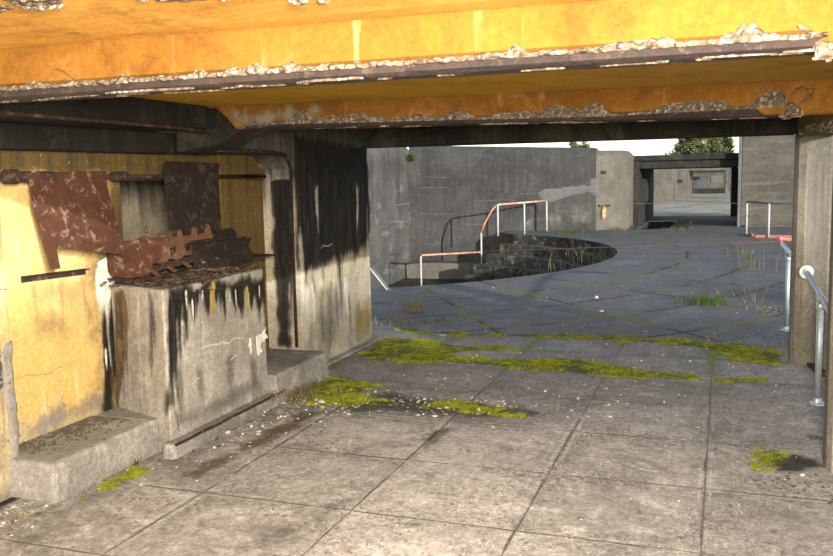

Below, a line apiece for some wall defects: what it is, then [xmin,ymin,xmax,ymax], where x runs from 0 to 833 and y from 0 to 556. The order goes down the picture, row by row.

spalling [0,0,64,13]
spalling [0,22,833,104]
spalling [243,88,833,137]
damp [271,136,370,348]
damp [96,258,128,411]
damp [166,275,266,412]